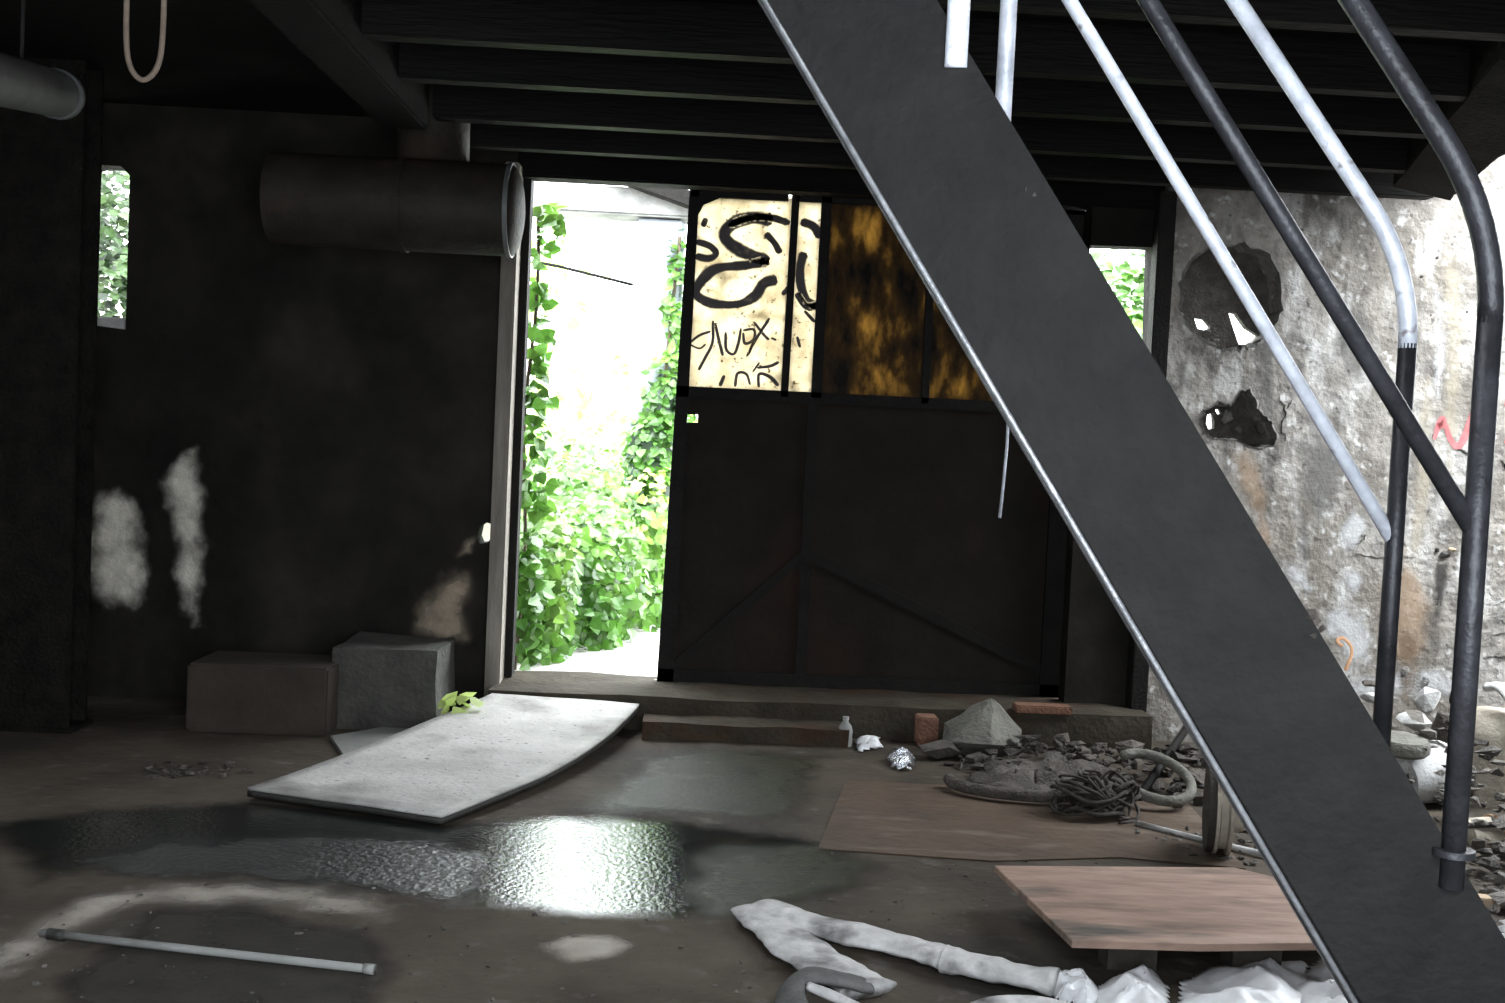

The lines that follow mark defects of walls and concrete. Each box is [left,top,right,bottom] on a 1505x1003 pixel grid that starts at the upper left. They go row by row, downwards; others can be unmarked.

spalling [1178,238,1285,354]
spalling [1199,386,1279,451]